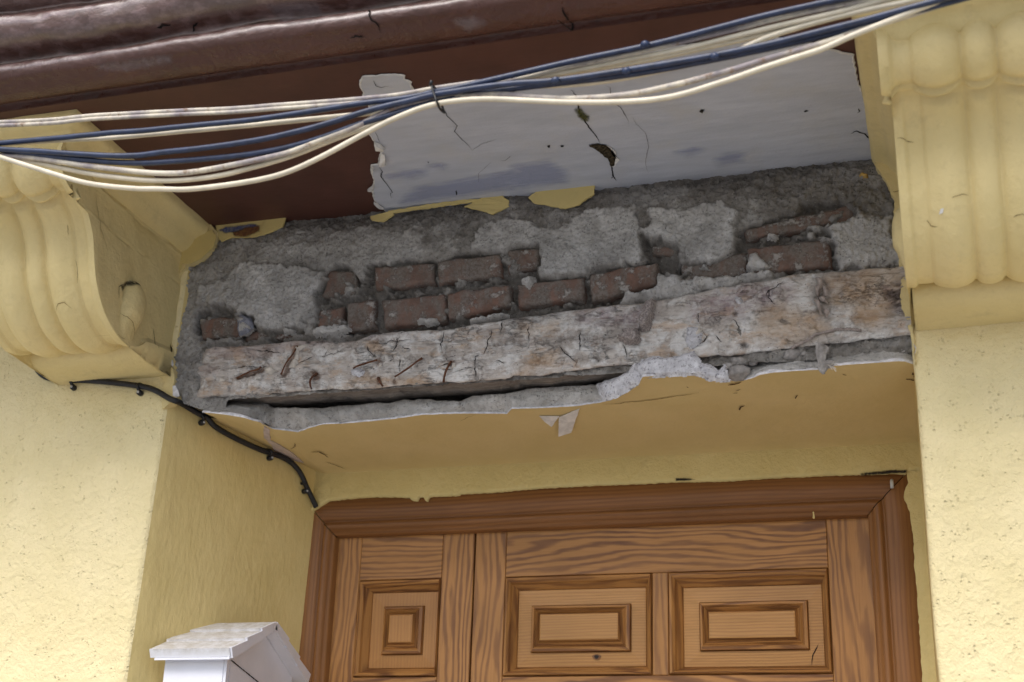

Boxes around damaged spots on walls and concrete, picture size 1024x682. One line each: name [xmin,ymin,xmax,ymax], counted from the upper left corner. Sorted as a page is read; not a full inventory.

rust [233,226,259,237]
spalling [159,37,916,463]
crack [440,323,503,374]